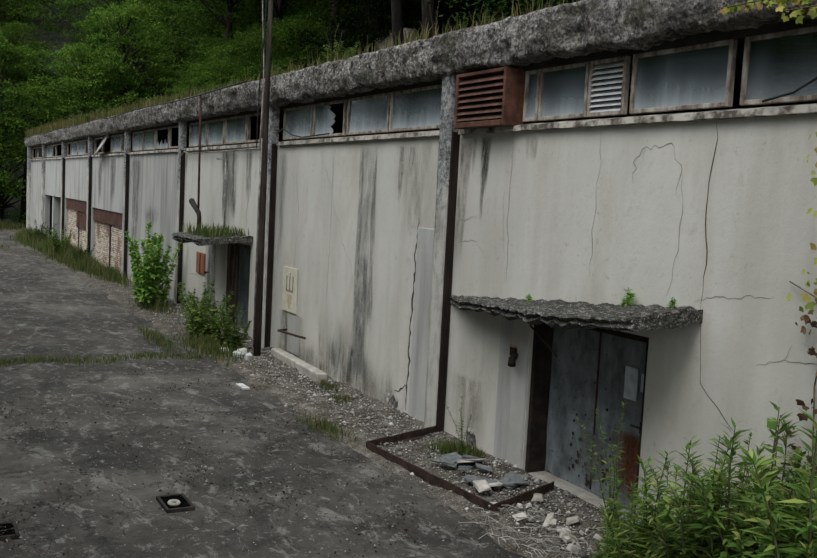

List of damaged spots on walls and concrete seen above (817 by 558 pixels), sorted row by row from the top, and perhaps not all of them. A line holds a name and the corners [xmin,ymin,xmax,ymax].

water stain [350,165,376,397]
crack [394,222,420,410]
crack [632,143,683,293]
crack [695,125,774,432]
corrosion [617,431,639,492]